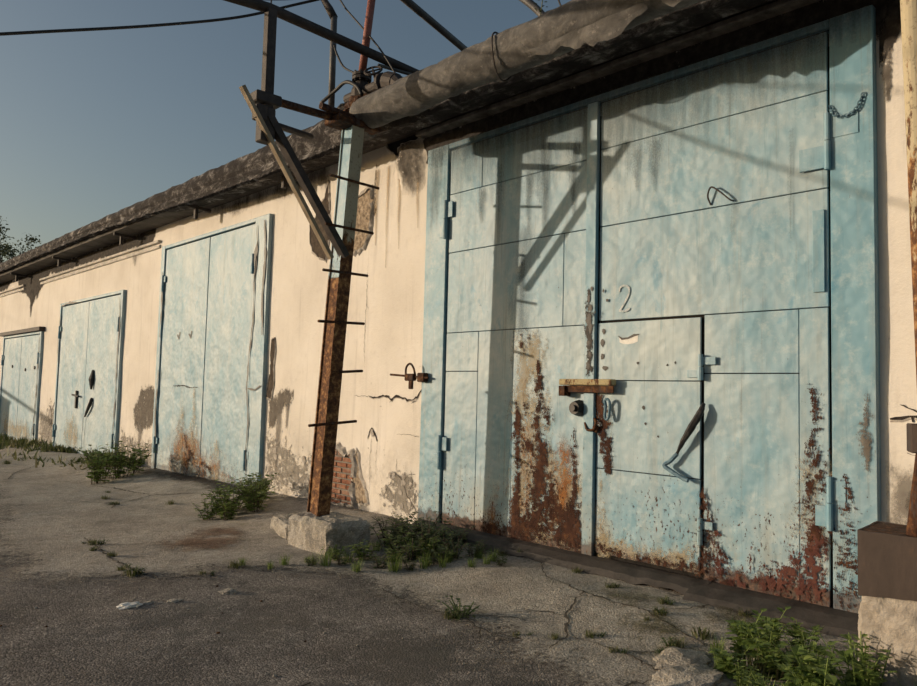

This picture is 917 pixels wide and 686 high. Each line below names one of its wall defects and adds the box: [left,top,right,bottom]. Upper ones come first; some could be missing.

water stain [375,0,901,215]
spalling [353,184,374,257]
water stain [133,384,155,442]
corrosion [169,389,229,480]
water stain [267,389,293,454]
crack [358,391,421,403]
corrosion [479,329,582,552]
corrosion [856,394,876,472]
crack [890,405,917,422]
spalling [331,442,419,518]
corrosion [594,383,861,609]
crack [379,561,735,686]